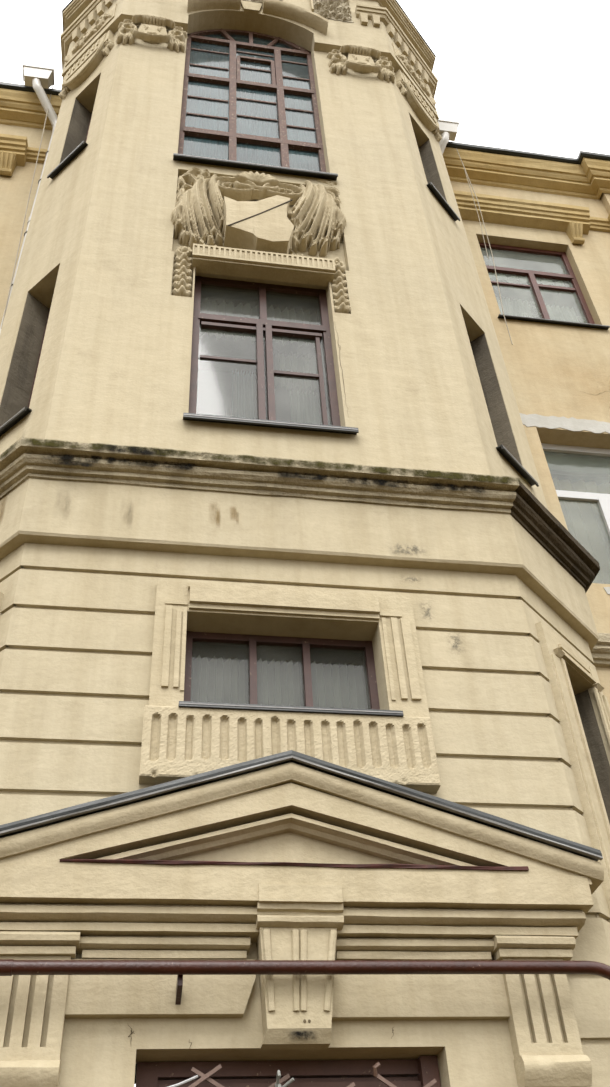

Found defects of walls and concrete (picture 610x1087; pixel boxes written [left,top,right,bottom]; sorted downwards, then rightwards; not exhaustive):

damp [48,445,195,469]